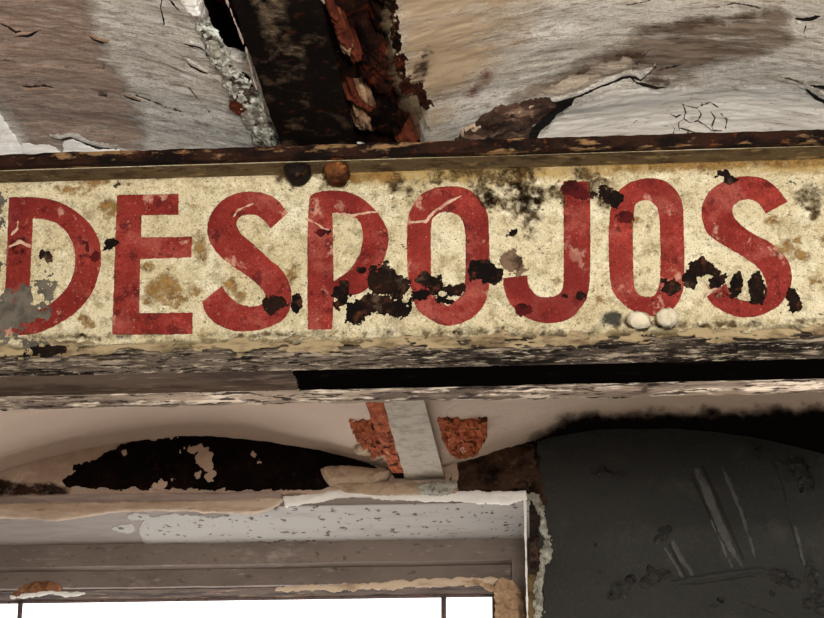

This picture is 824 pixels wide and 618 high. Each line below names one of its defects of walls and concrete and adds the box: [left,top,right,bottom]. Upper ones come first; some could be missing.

peeling [0,115,121,155]
spalling [180,0,279,147]
spalling [325,0,434,142]
crack [551,50,683,104]
leakage [514,9,790,104]
crack [670,95,727,134]
crack [776,77,824,104]
peeling [330,247,529,326]
peeling [62,402,403,492]
peeling [111,416,553,618]